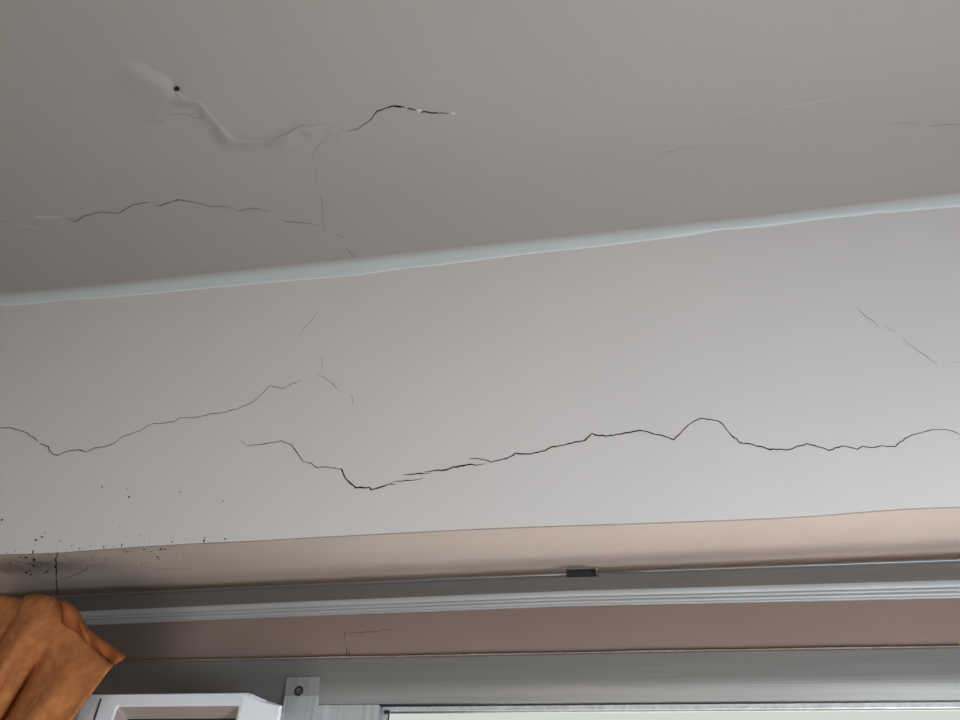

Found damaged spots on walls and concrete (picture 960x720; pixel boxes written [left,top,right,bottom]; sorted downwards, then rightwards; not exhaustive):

crack [349,105,448,132]
crack [67,149,354,257]
crack [0,356,353,456]
crack [242,418,960,490]
crack [55,552,100,593]